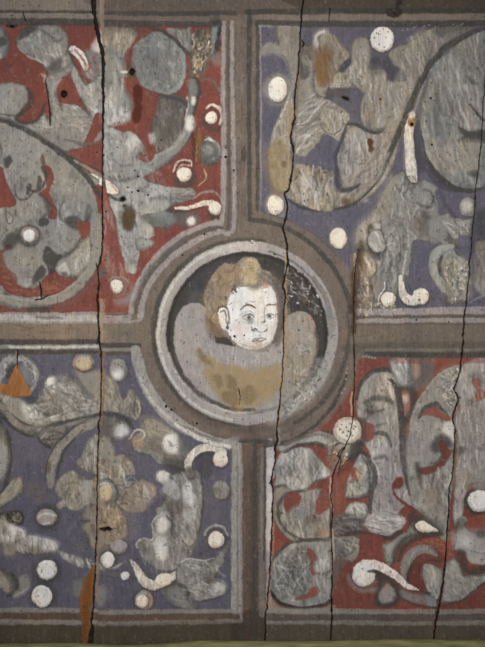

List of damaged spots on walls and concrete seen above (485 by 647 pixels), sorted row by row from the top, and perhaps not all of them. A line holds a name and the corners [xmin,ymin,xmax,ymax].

rust [79,565,95,643]
crack [91,0,106,625]
crack [264,0,305,641]
crack [330,248,359,641]
crack [432,82,485,639]